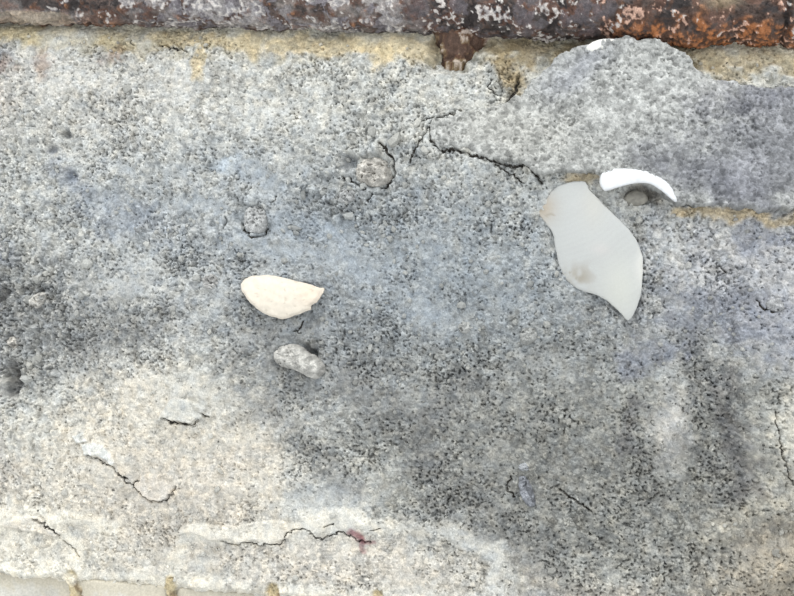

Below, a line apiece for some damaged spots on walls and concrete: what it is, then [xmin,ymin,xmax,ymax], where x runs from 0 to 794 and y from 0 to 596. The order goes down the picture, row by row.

rust [0,0,794,97]
crack [343,111,543,202]
crack [91,456,176,502]
crack [231,523,381,546]